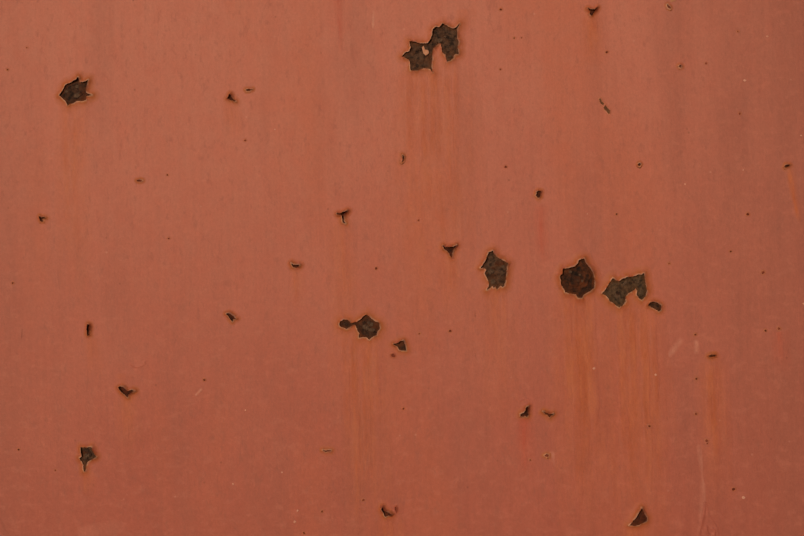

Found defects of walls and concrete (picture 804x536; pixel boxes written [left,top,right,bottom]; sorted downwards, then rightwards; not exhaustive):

peeling [395,16,467,74]
peeling [53,70,100,107]
corrosion [320,59,495,536]
peeling [478,243,516,292]
peeling [551,250,664,314]
peeling [338,308,383,341]
corrosion [514,288,680,536]
peeling [74,441,102,473]
peeling [627,504,649,528]